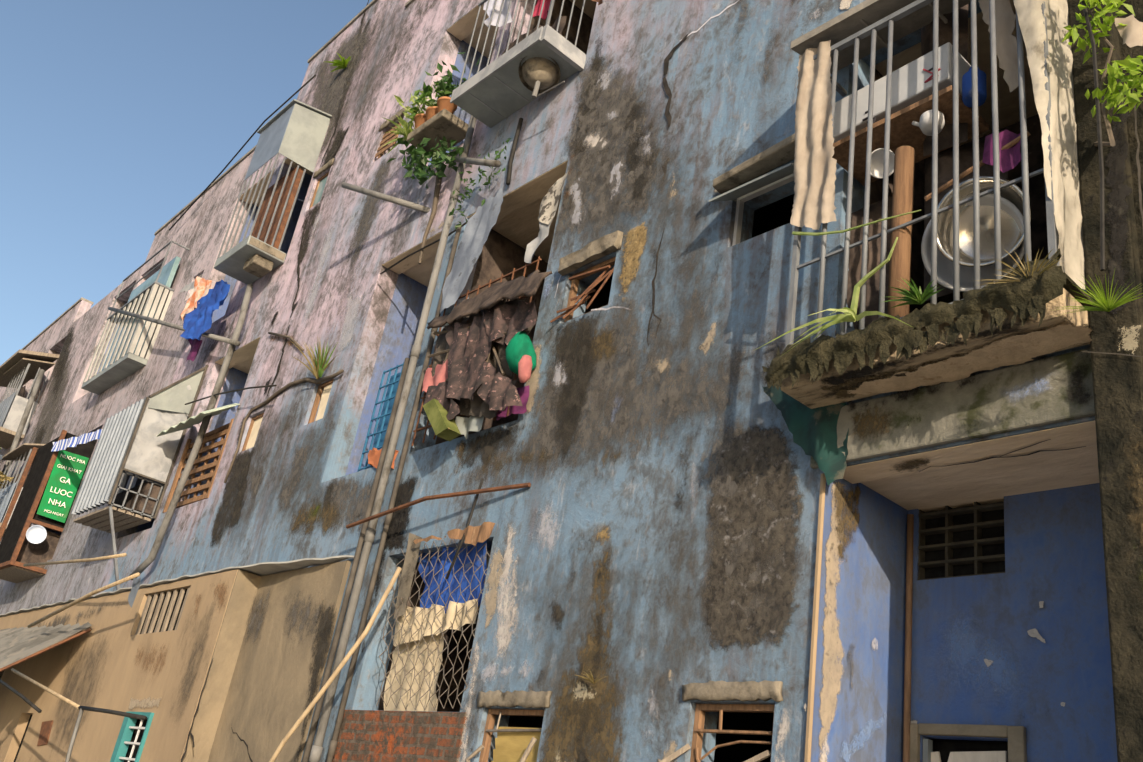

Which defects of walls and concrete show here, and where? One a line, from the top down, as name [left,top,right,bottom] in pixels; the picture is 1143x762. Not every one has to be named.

mould [572,36,605,164]
peeling [554,59,676,300]
mould [623,99,656,211]
crack [661,158,669,179]
crack [663,0,739,128]
crack [919,439,1086,472]
damp [540,527,625,762]
flaking render [804,481,885,762]
peeling [775,714,788,762]